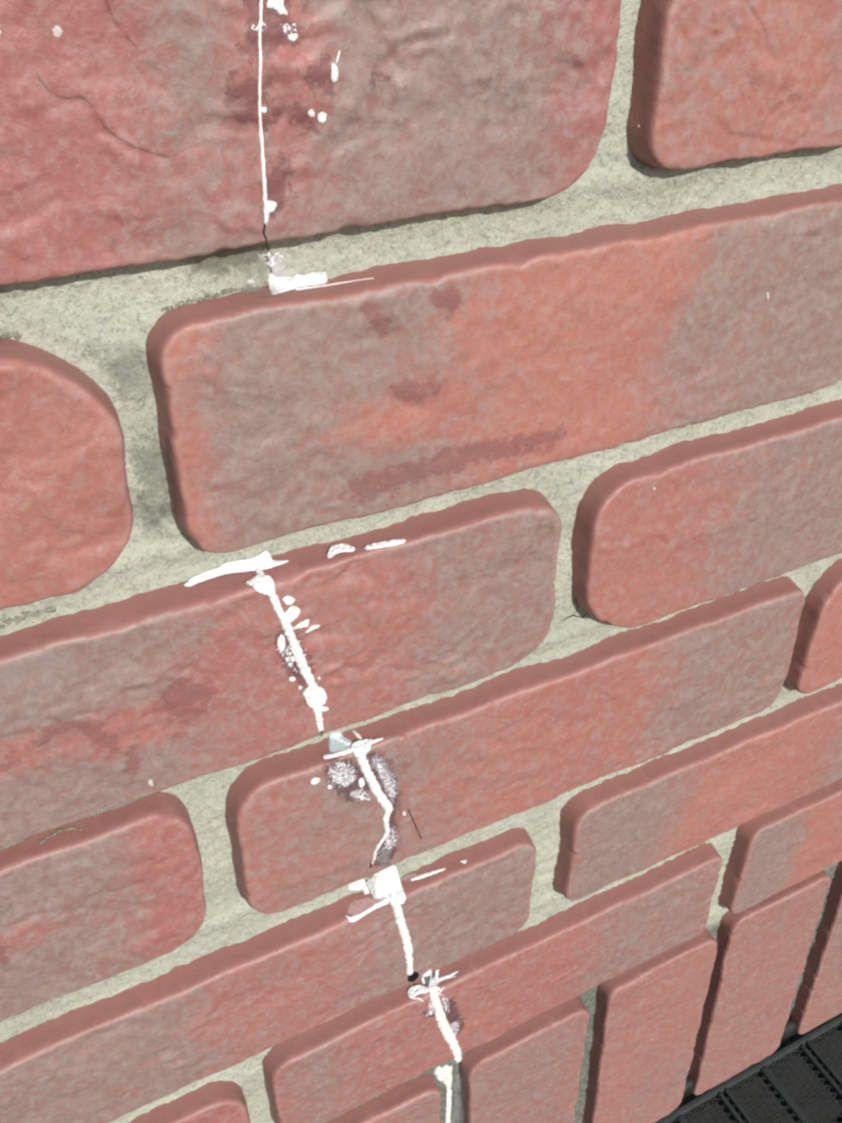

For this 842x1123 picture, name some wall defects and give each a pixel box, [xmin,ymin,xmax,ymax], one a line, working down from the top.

crack [263,219,272,273]
crack [408,972,419,982]